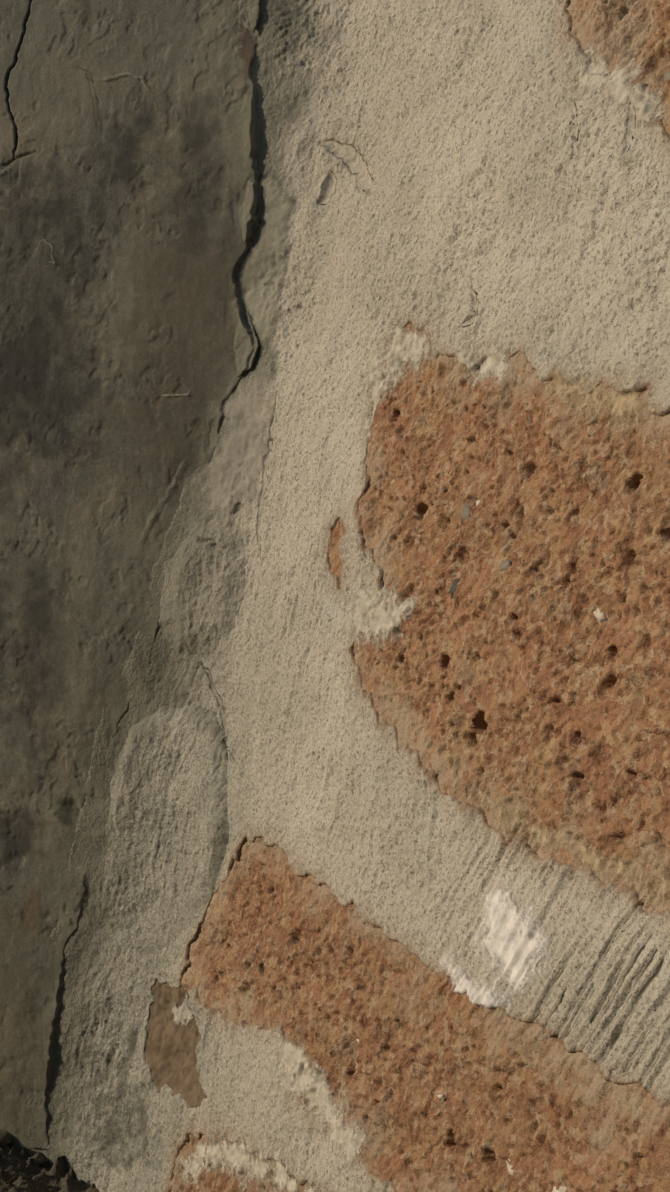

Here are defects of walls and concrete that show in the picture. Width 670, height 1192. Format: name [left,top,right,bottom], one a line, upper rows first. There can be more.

crack [0,0,36,167]
spalling [328,519,345,588]
damp [441,887,548,1008]
spalling [145,980,207,1108]